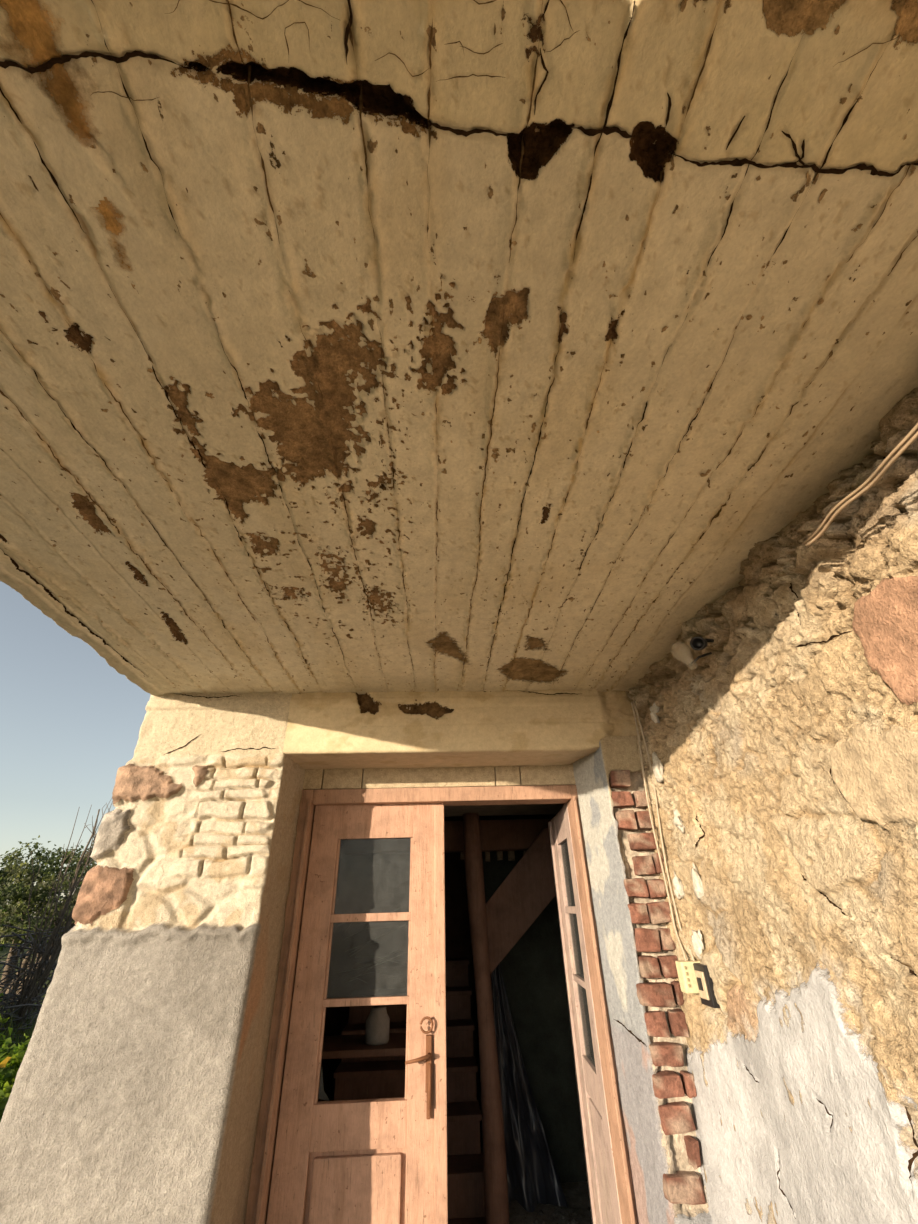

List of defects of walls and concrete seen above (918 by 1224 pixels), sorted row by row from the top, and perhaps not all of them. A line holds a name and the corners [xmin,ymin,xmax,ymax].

spalling [762,0,847,37]
crack [0,0,918,271]
crack [0,285,306,698]
peeling [49,468,267,692]
peeling [133,233,531,647]
peeling [356,531,648,720]
peeling [526,501,577,534]
peeling [550,301,576,357]
crack [376,305,833,695]
peeling [603,261,647,372]
crack [166,734,276,754]
peeling [609,770,918,1224]